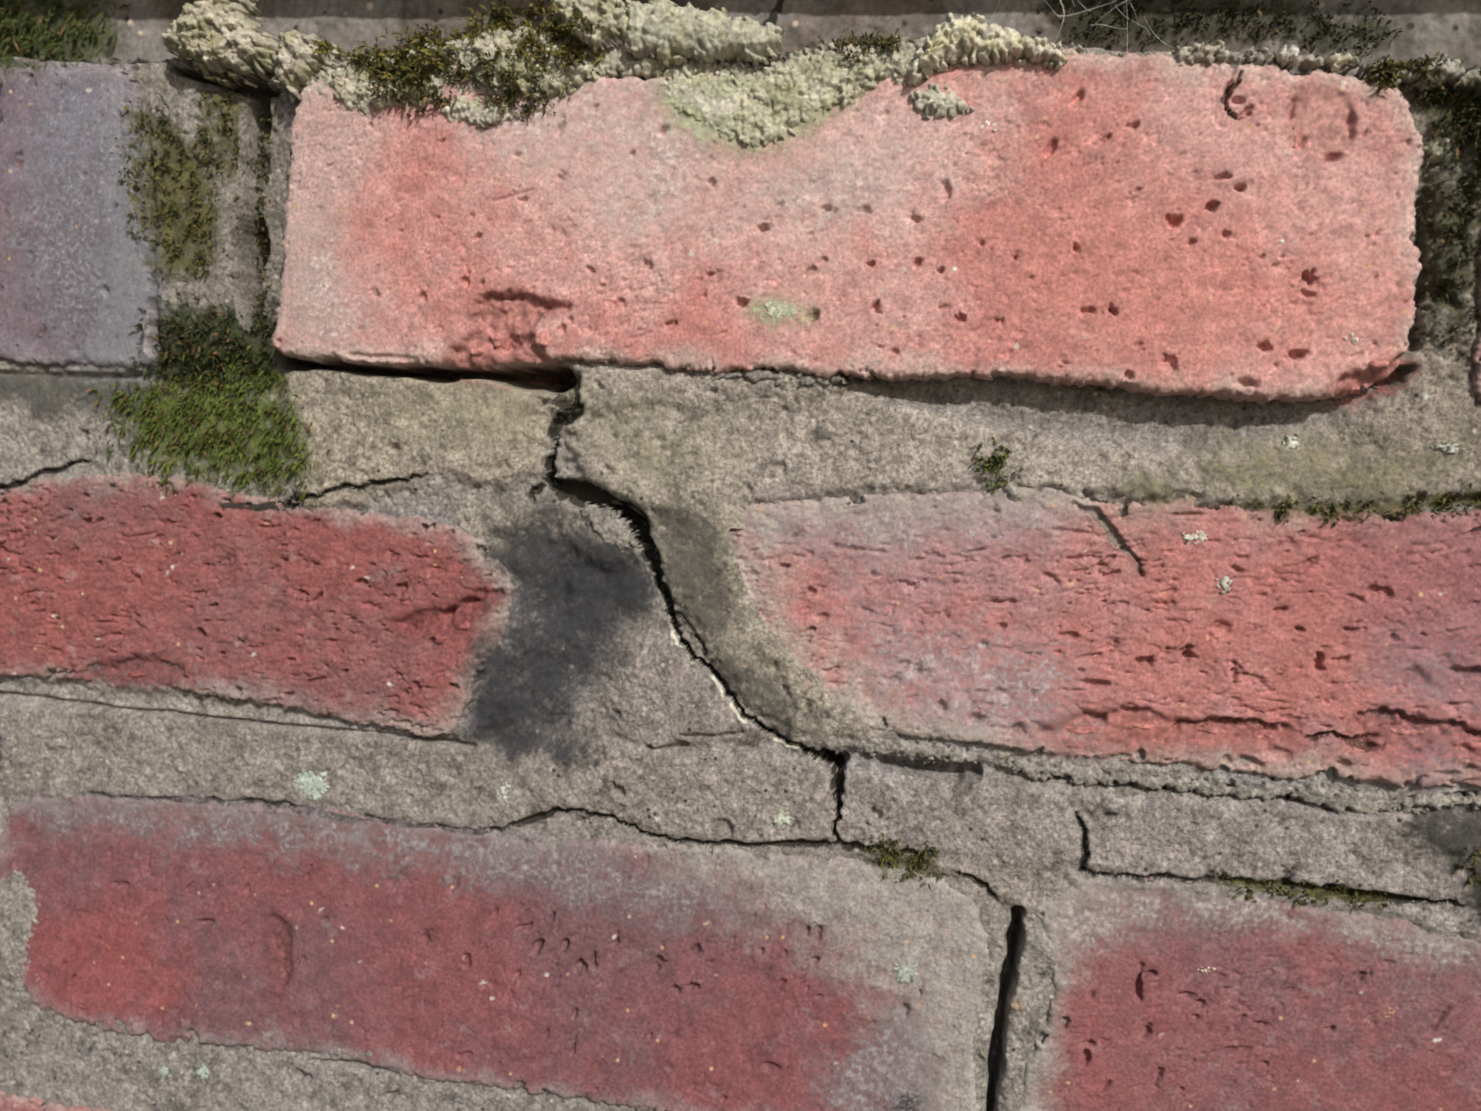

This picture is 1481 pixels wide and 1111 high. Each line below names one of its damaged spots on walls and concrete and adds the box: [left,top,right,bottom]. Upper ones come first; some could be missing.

crack [762,0,784,26]
leakage [471,505,722,768]
crack [960,873,998,898]